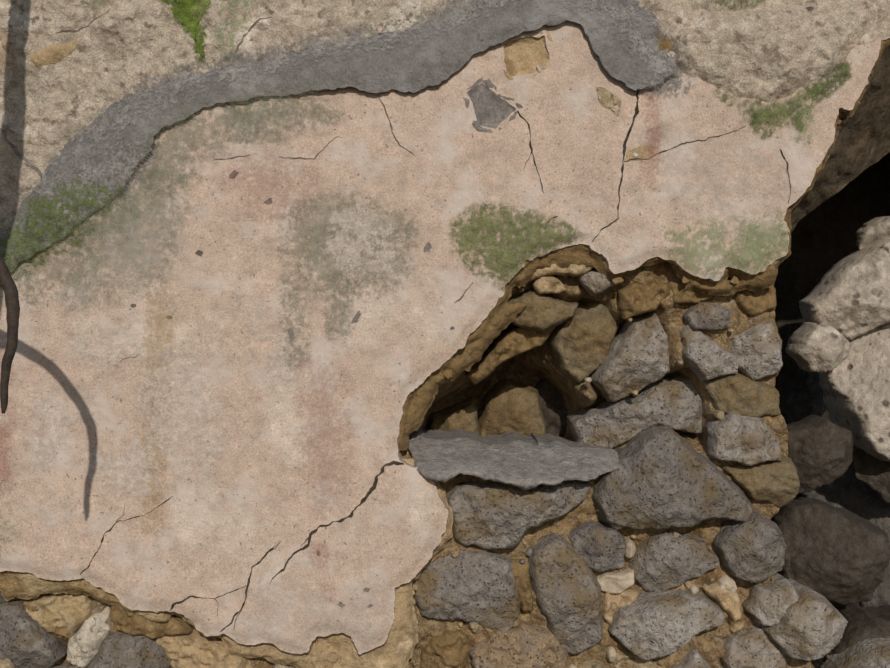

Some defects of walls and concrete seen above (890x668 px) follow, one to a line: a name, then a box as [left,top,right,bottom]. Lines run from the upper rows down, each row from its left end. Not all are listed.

flaking render [29,39,82,67]
flaking render [378,0,422,34]
spalling [503,29,553,81]
spalling [656,27,675,57]
damp [20,92,325,304]
crack [379,97,414,155]
crack [517,111,544,193]
crack [592,89,745,242]
spalling [397,38,890,465]
crack [80,496,172,575]
spalling [0,482,453,668]
crack [169,461,404,632]